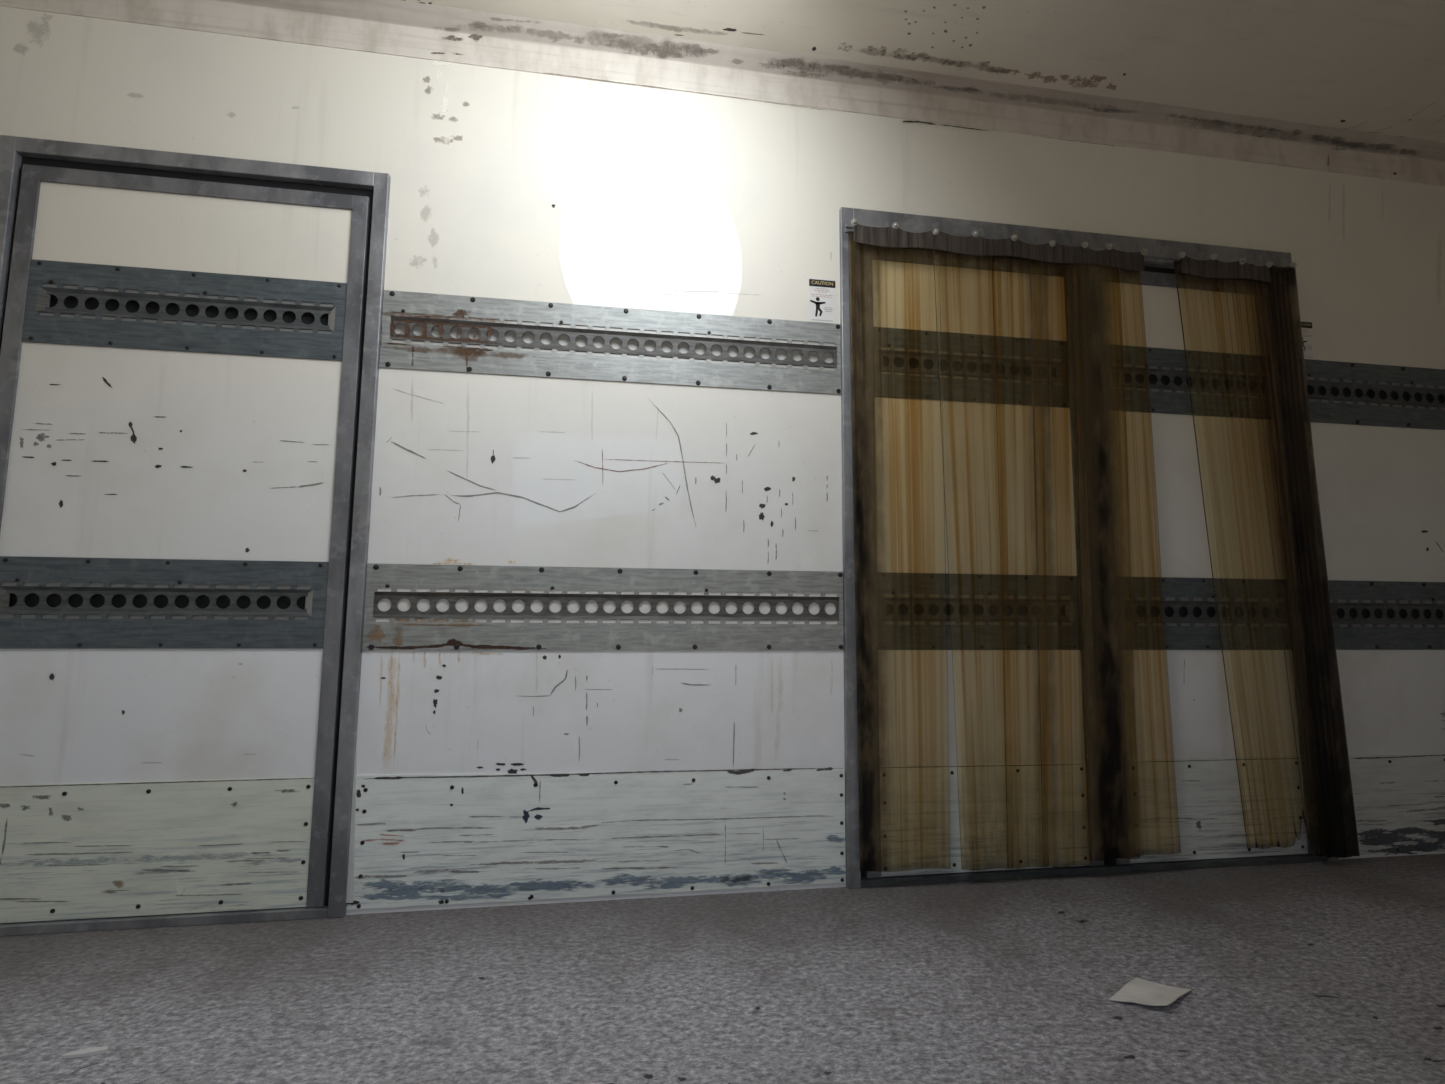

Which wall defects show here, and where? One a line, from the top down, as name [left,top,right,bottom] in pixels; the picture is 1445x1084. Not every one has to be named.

leakage [431,34,482,55]
leakage [1003,69,1117,90]
corrosion [380,310,523,372]